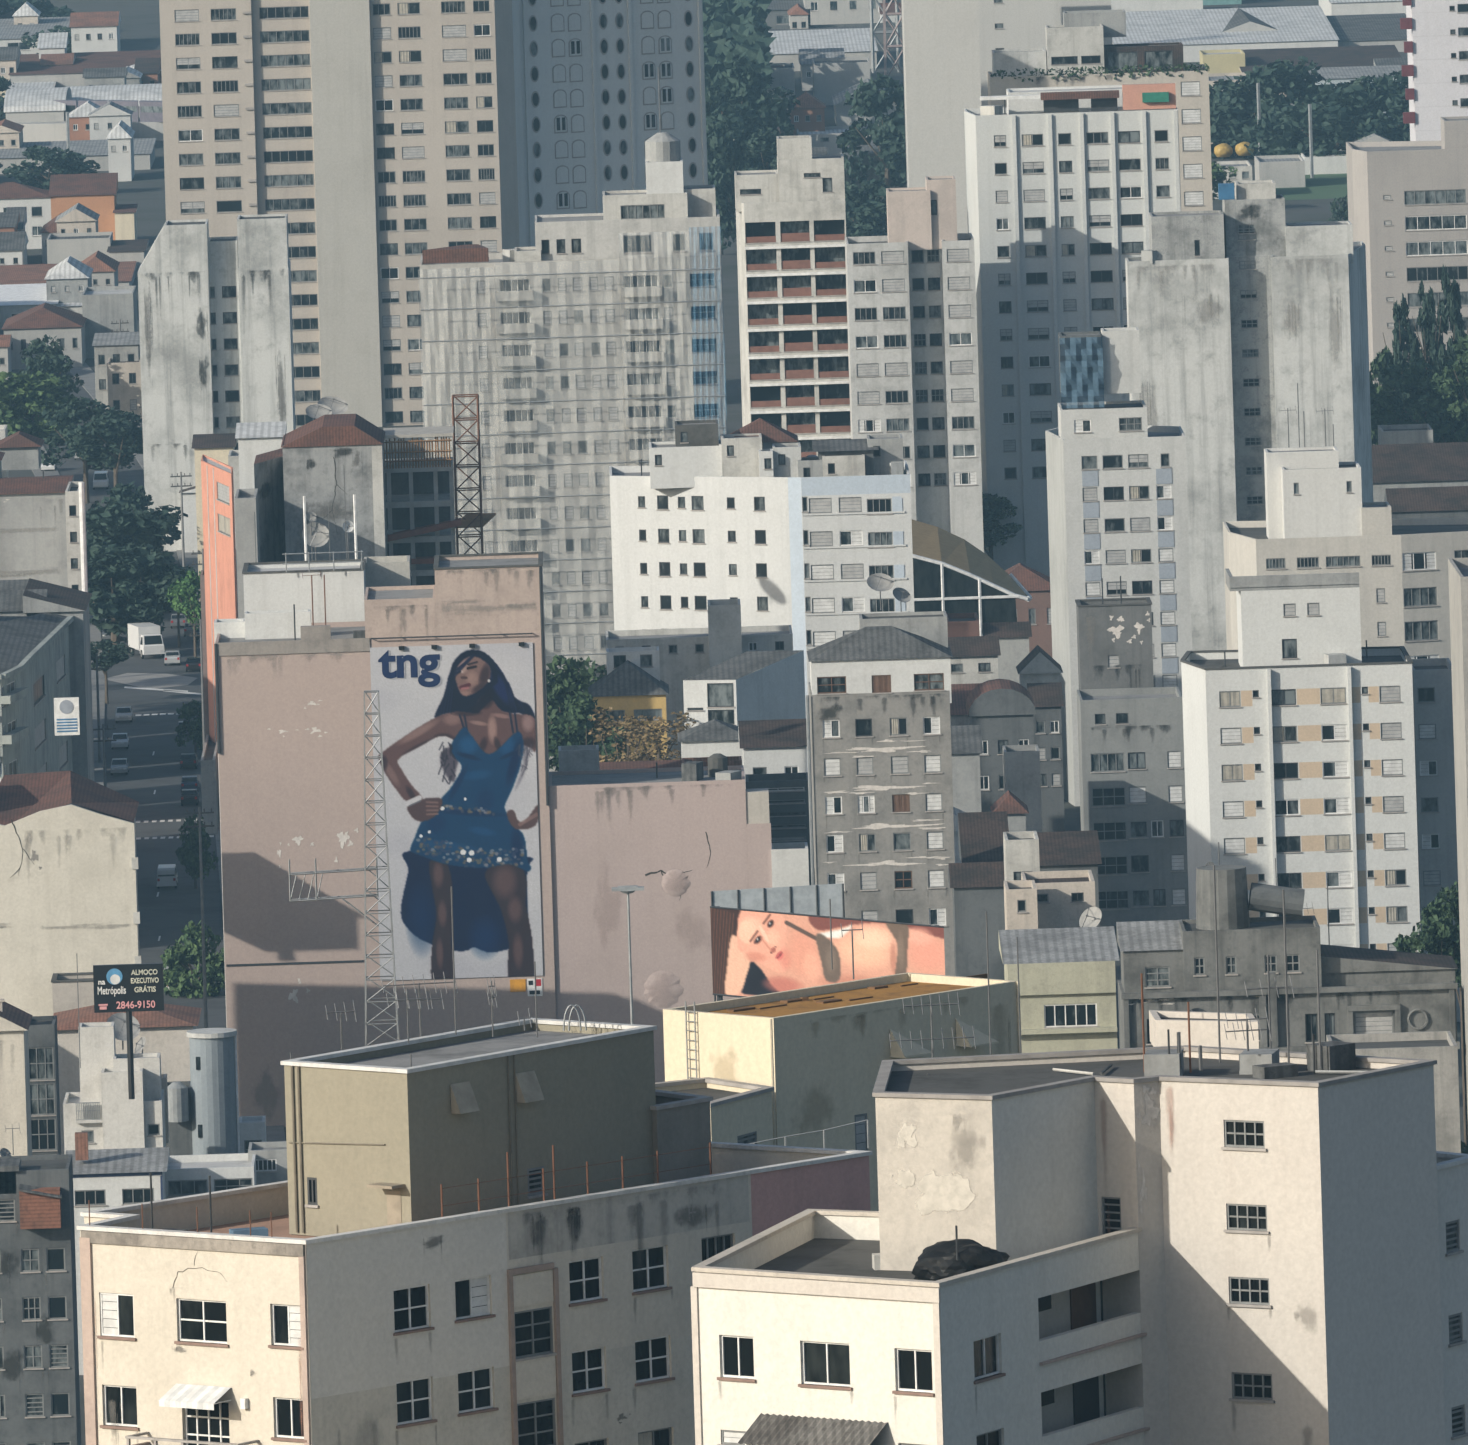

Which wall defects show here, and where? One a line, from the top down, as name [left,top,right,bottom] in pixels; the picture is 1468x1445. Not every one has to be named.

damp [197,314,205,336]
spalling [1107,611,1150,645]
crack [10,819,34,878]
peeling [334,828,358,862]
damp [568,1208,581,1237]